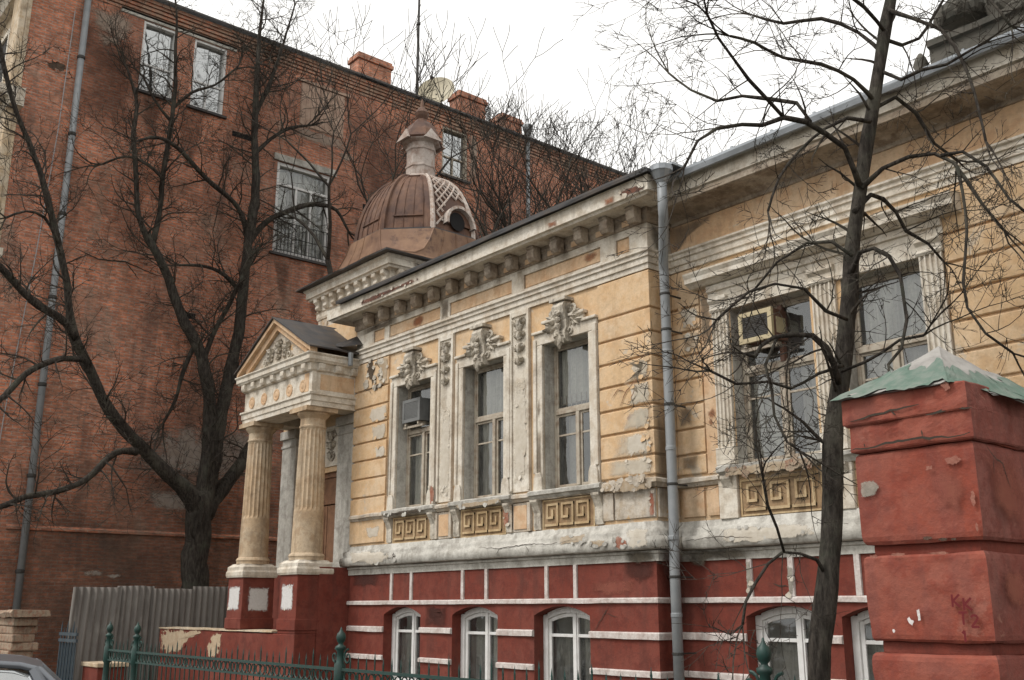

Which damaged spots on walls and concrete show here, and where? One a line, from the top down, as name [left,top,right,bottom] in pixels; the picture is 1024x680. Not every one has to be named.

spalling [363,358,388,391]
flaking render [600,356,654,515]
crack [850,404,1011,487]
flaking render [861,481,879,497]
flaking render [560,528,647,549]
flaking render [350,550,396,565]
peeling [161,629,221,657]